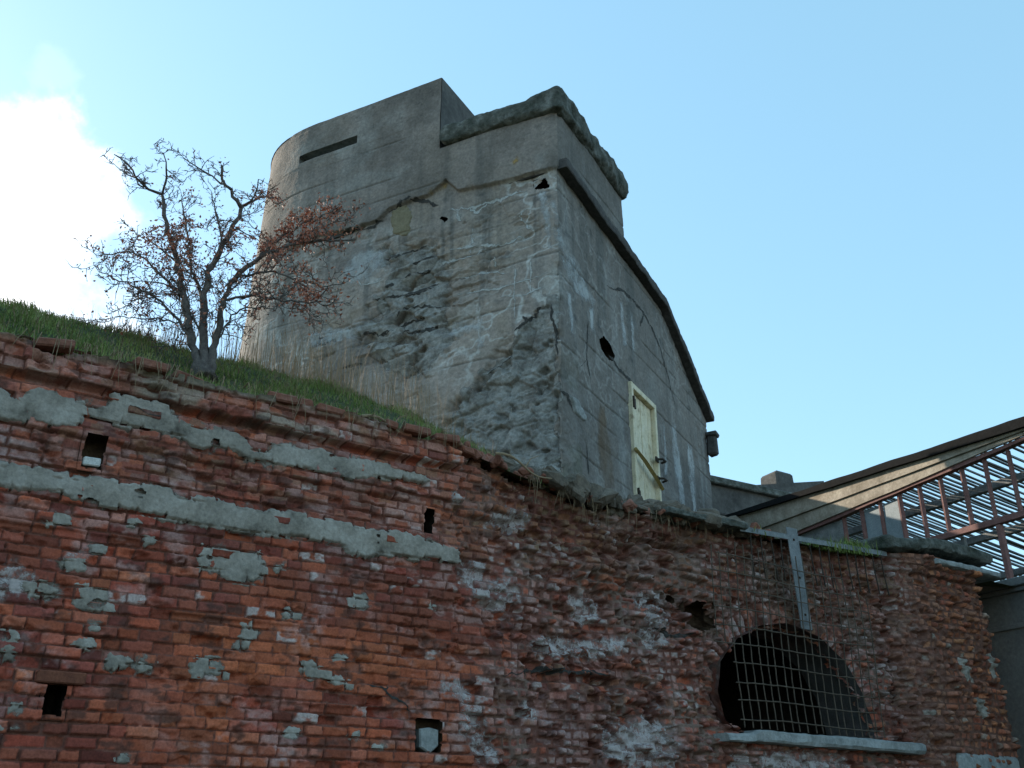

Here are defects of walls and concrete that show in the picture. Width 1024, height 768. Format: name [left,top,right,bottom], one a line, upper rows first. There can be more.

damp [345,250,384,281]
crack [343,191,558,355]
crack [607,285,677,409]
spalling [76,432,109,473]
spalling [663,591,715,631]